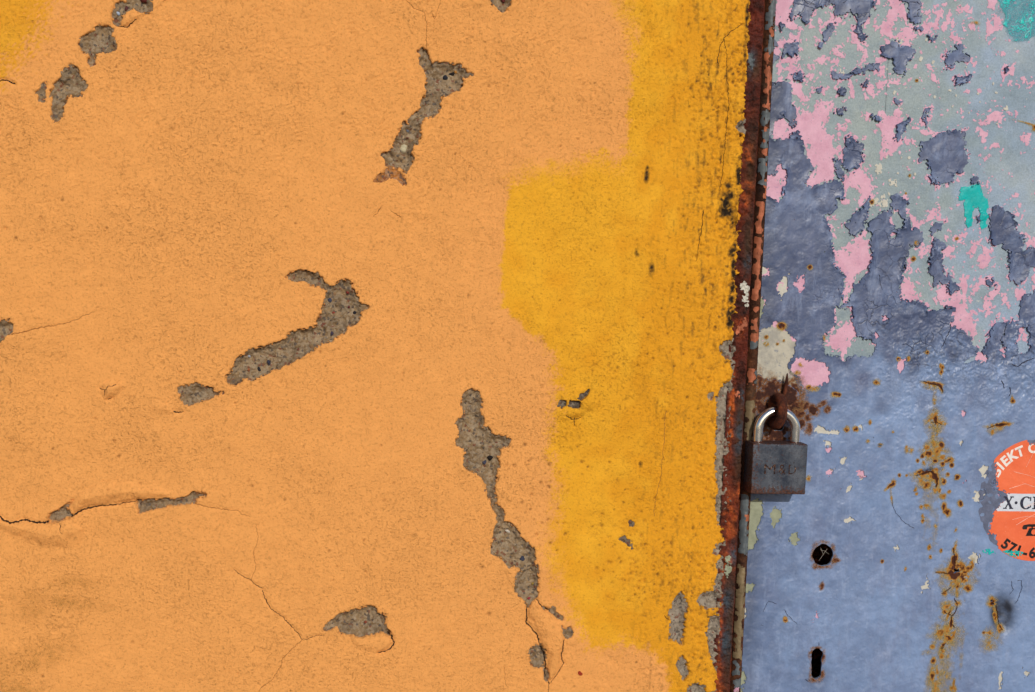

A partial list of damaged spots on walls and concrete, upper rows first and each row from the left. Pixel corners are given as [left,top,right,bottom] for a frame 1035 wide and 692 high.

spalling [35,0,153,123]
spalling [373,48,474,186]
crack [0,500,137,533]
spalling [177,270,368,406]
spalling [455,389,574,639]
rust [754,363,841,441]
peeling [668,0,1035,692]
rust [884,363,963,528]
crack [196,490,321,691]
spalling [323,605,391,637]
rust [927,529,974,692]
rust [982,596,1004,649]